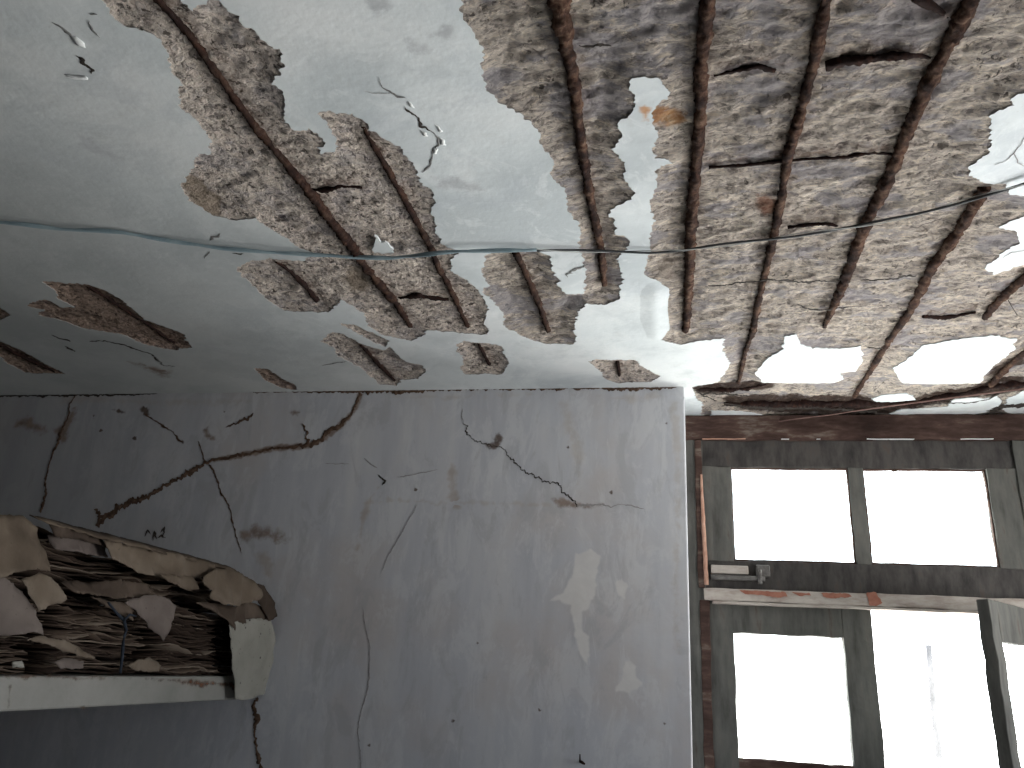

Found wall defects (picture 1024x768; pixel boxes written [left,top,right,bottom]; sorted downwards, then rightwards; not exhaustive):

crack [365,78,445,172]
corrosion [629,101,695,132]
spalling [103,0,1024,416]
corrosion [746,189,790,221]
spalling [28,281,191,350]
corrosion [692,348,1024,415]
crack [0,387,892,553]
peeling [547,547,603,667]
crack [251,697,263,768]